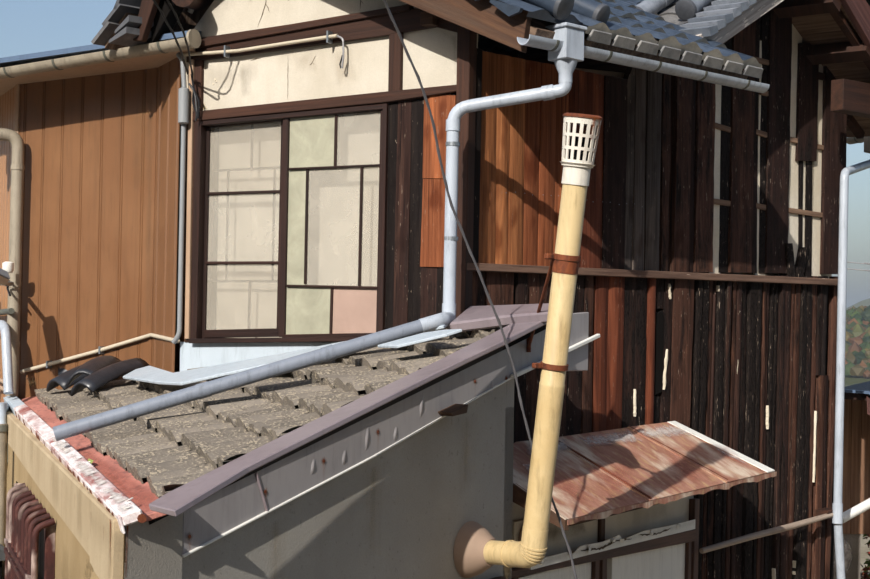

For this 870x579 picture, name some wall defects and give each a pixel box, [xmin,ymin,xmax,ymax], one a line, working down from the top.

rust [15,412,114,545]